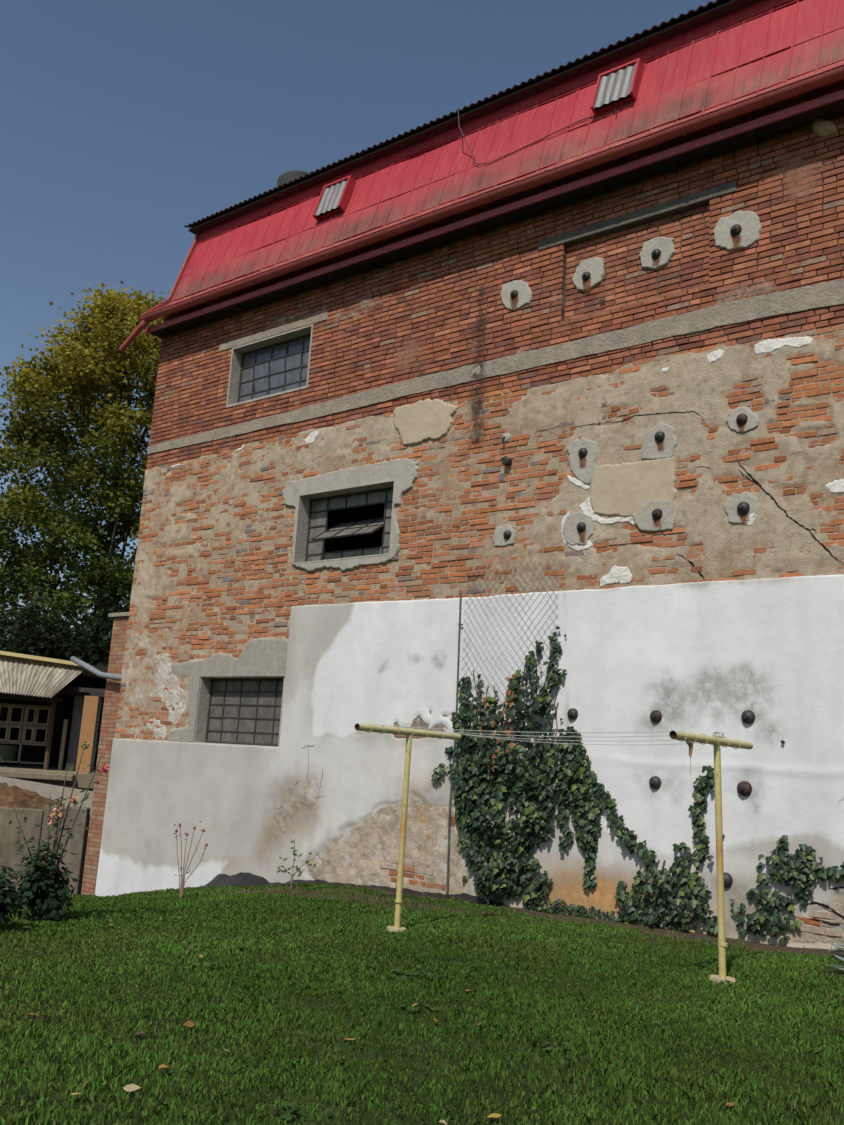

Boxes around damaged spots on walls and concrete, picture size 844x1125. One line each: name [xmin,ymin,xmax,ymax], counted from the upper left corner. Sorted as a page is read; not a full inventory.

flaking render [304,431,319,444]
crack [572,411,703,428]
spalling [675,333,844,497]
spalling [138,499,206,605]
spalling [560,474,703,587]
spalling [707,571,738,581]
crack [738,460,844,564]
flaking render [783,479,844,540]
flaking render [136,649,187,741]
spalling [393,710,453,738]
spalling [305,797,468,894]
crack [806,886,844,925]